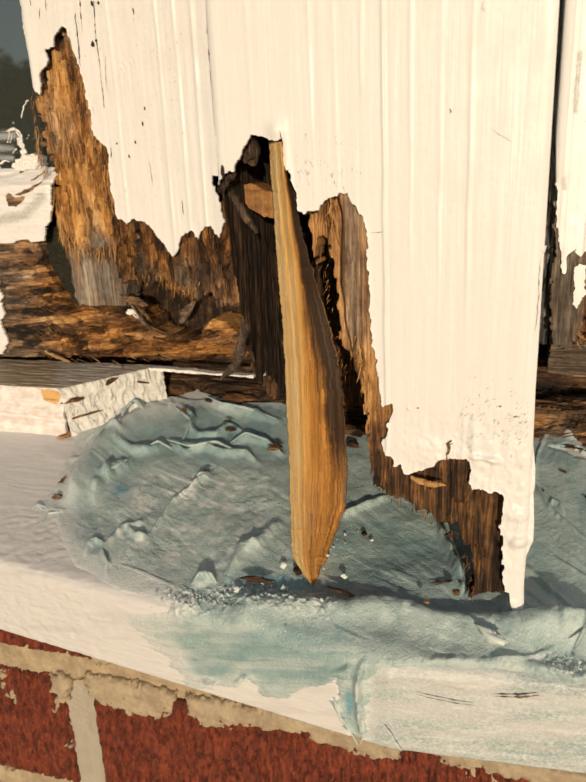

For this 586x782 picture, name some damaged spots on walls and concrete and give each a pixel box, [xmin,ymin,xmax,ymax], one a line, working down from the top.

peeling [6,171,45,207]